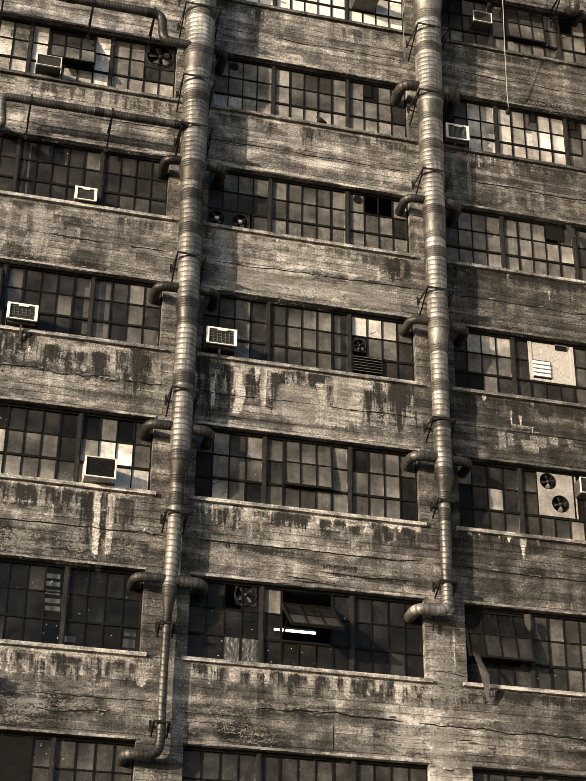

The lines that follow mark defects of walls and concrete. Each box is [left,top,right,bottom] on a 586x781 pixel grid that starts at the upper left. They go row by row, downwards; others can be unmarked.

leakage [0,330,165,398]
leakage [195,358,418,432]
leakage [0,478,153,594]
leakage [195,501,421,556]
leakage [321,564,421,585]
leakage [0,644,154,692]
leakage [193,662,424,708]
crack [256,707,586,762]